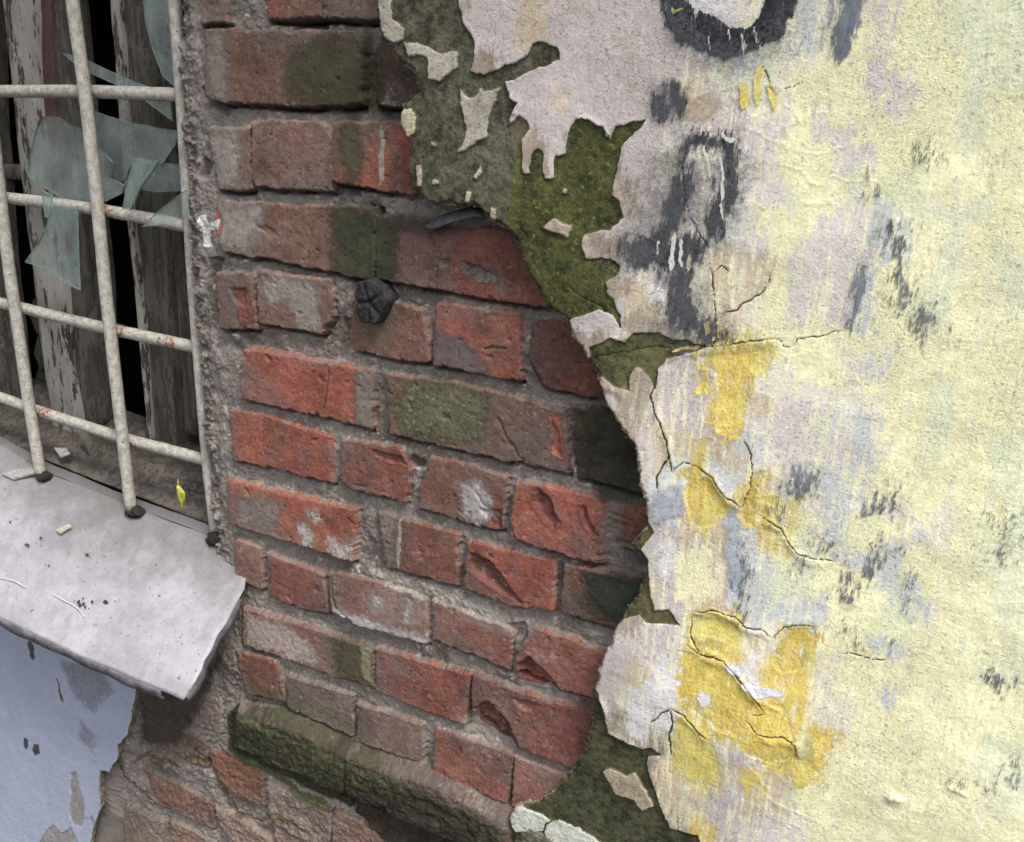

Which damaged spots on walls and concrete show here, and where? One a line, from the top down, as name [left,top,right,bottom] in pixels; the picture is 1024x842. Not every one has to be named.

peeling [378,0,785,446]
crack [680,162,835,348]
spalling [371,448,412,468]
spalling [548,415,564,461]
crack [596,345,831,561]
spalling [485,492,504,530]
spalling [530,487,562,533]
spalling [465,551,524,604]
peeling [510,524,843,842]
crack [689,609,813,753]
spalling [473,700,519,748]
crack [652,709,707,753]